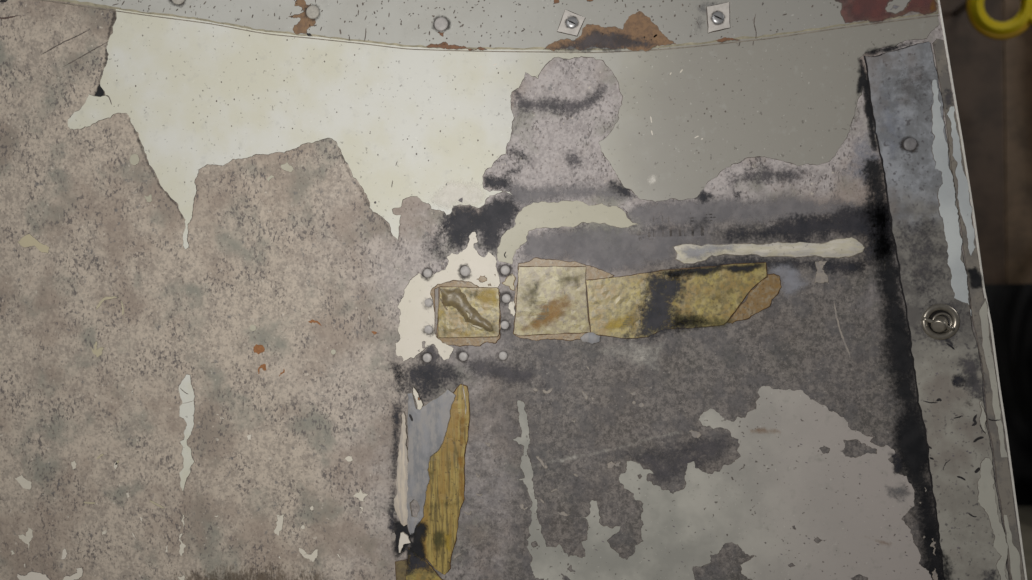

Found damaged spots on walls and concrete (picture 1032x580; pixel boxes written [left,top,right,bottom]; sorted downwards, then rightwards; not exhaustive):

rust [835,0,937,23]
peeling [68,9,939,250]
water stain [857,44,903,150]
peeling [395,200,639,361]
peeling [15,472,32,490]
peeling [179,374,195,490]
peeling [513,386,938,580]
peeling [11,524,34,555]
peeling [17,564,83,580]